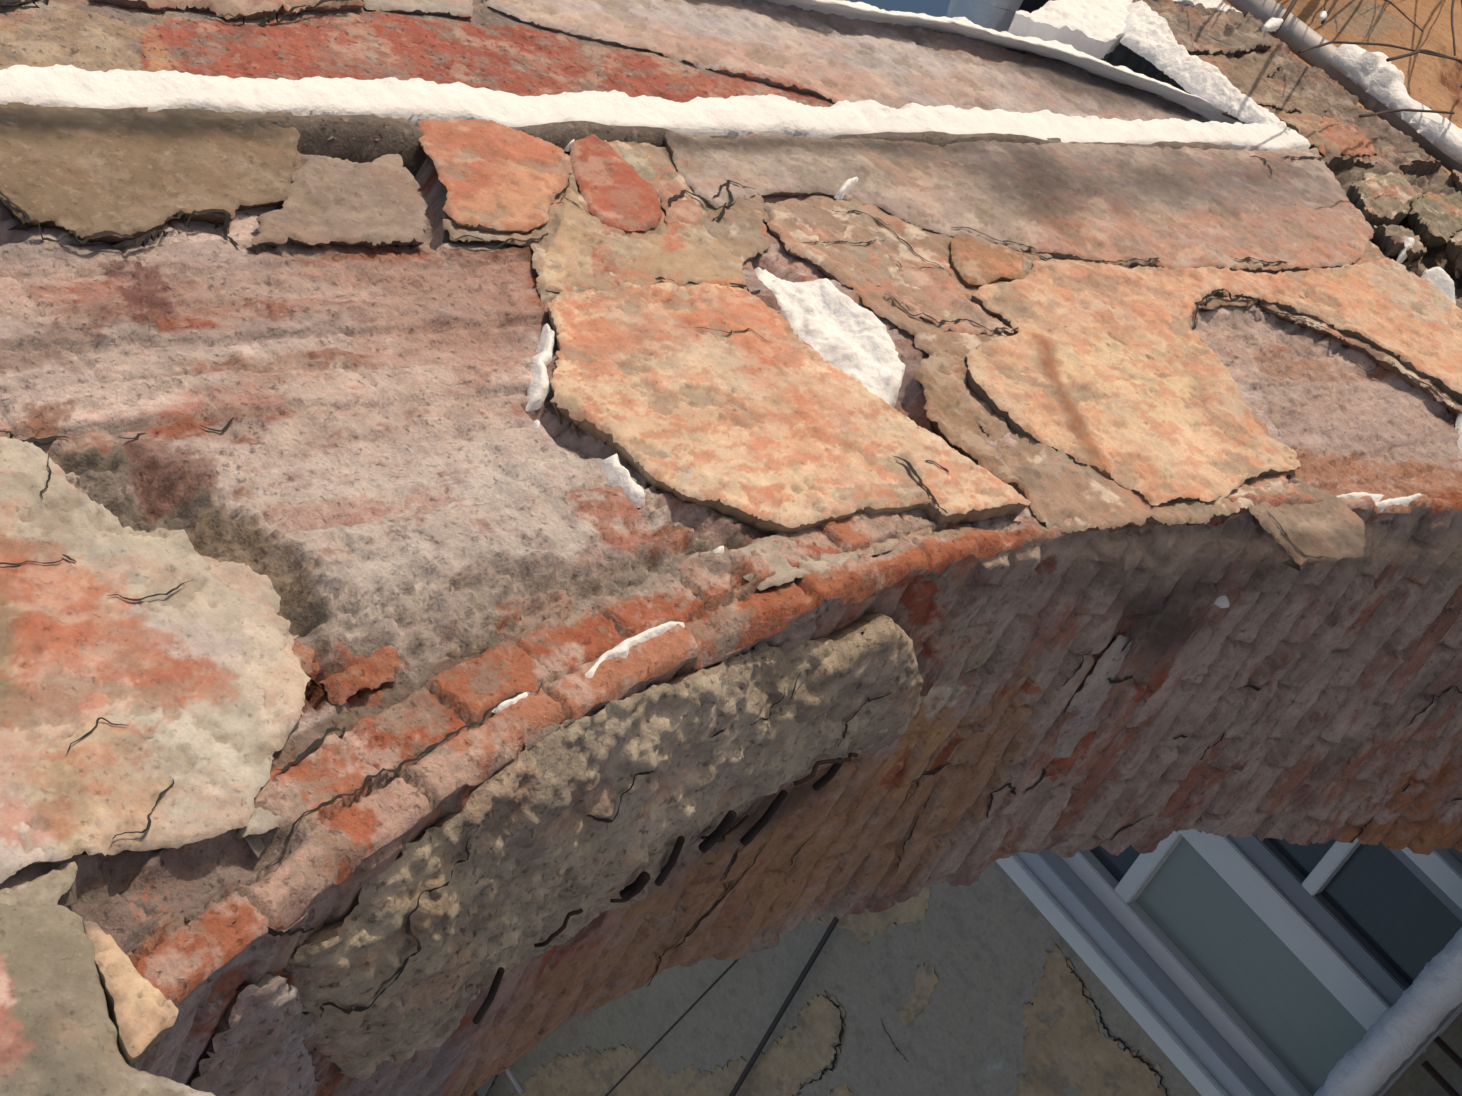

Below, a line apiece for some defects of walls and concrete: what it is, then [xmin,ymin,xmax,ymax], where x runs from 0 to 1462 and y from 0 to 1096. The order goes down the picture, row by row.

crack [0,191,238,248]
flaking render [0,0,1462,591]
crack [951,227,1159,263]
crack [1192,256,1462,406]
crack [0,431,70,499]
crack [67,717,129,753]
crack [112,778,174,839]
crack [272,683,542,865]
crack [320,825,480,1018]
peeling [816,887,931,947]
peeling [512,995,854,1096]
peeling [1015,944,1166,1096]